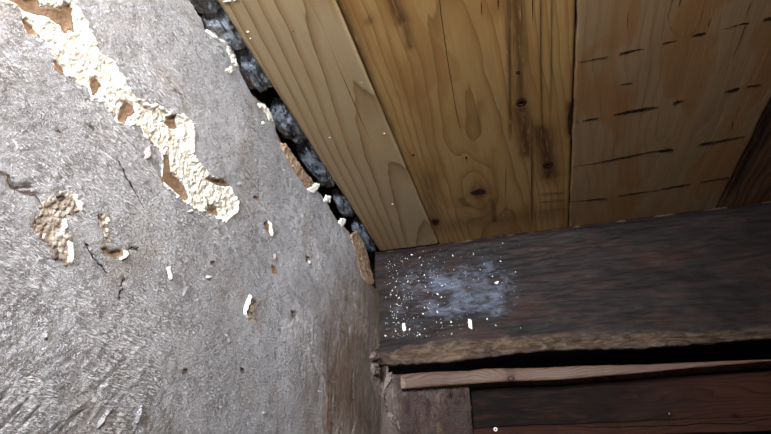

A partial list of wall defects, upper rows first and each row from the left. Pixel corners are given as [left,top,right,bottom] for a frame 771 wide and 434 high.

spalling [1,0,240,224]
spalling [252,94,274,125]
crack [0,171,42,205]
spalling [29,191,84,267]
spalling [96,212,139,261]
spalling [244,295,259,323]